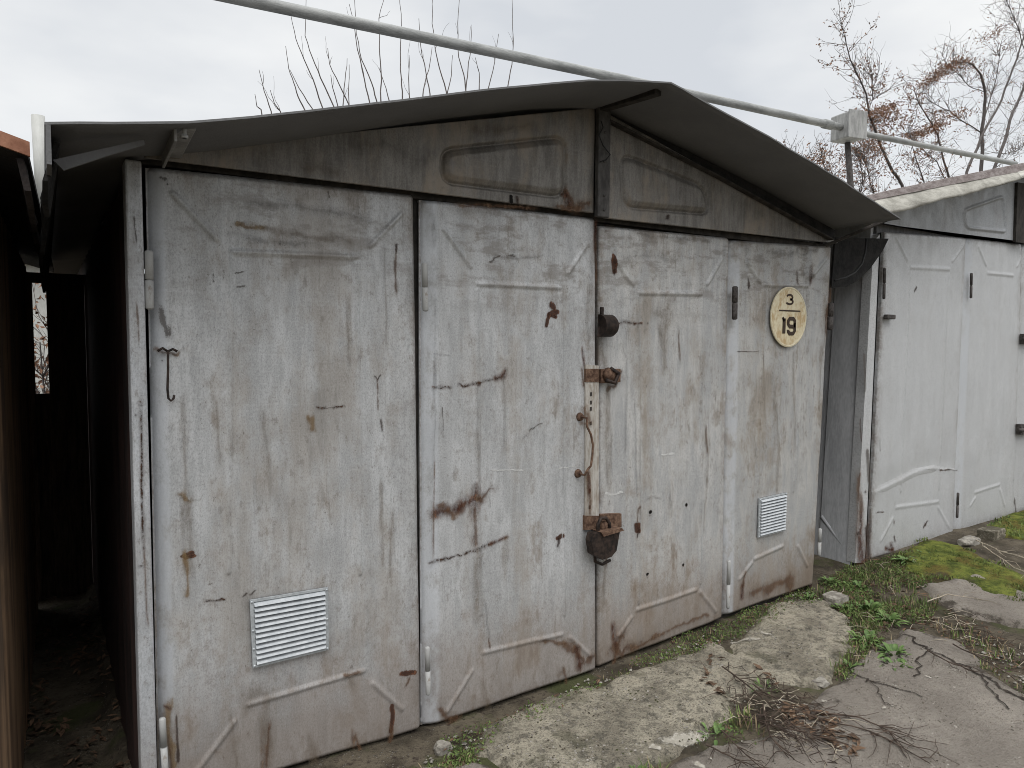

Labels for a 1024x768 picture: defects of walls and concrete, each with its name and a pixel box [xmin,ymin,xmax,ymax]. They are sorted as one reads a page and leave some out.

rust [545,301,559,327]
rust [432,488,493,546]
rust [180,551,196,597]
rust [543,640,595,669]
rust [611,613,709,664]